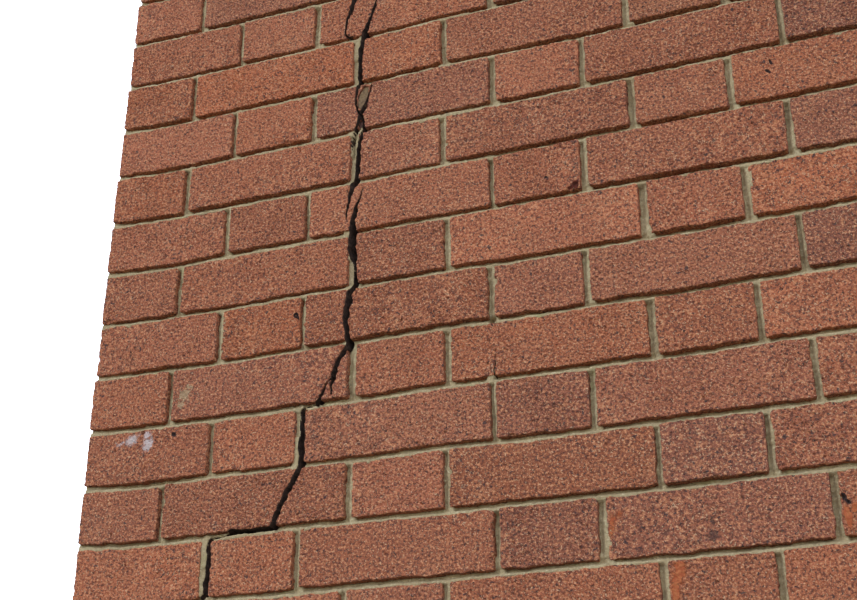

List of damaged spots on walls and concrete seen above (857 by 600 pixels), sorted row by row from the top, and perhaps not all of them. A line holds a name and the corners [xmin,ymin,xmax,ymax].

crack [200,0,377,600]